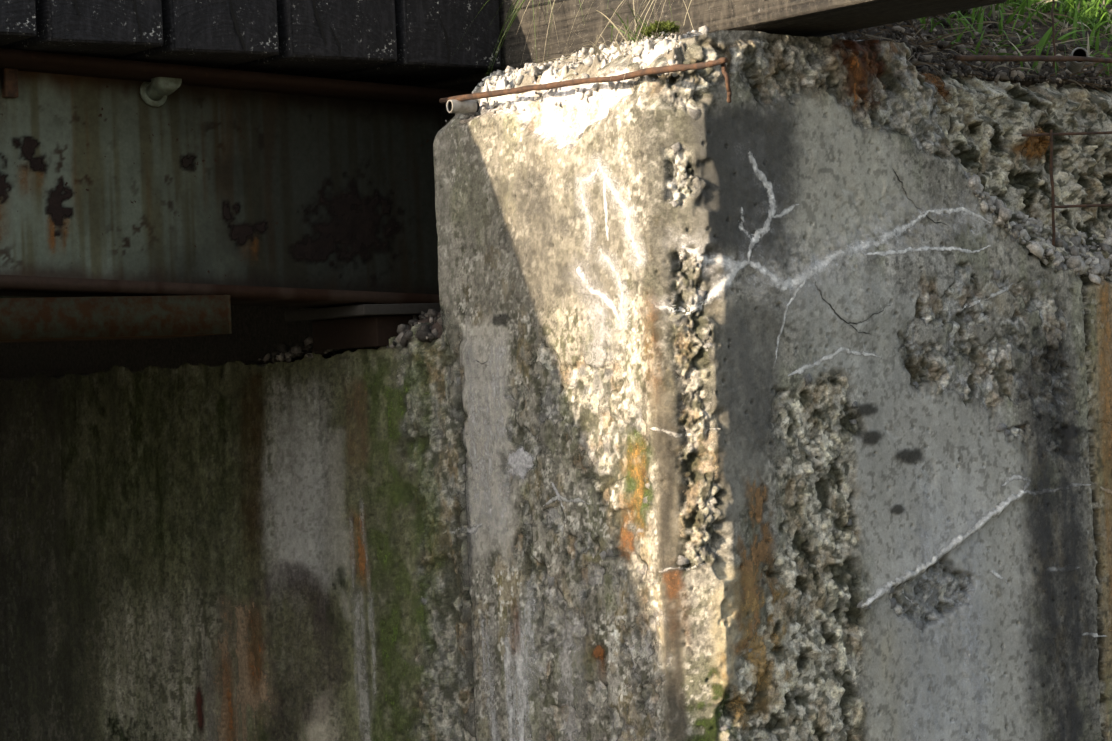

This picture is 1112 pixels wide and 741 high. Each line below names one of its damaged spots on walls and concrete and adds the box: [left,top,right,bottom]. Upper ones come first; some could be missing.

spalling [460,34,1112,287]
rust [833,39,897,109]
crack [570,159,644,368]
crack [655,152,991,376]
spalling [900,262,1081,457]
crack [961,281,1023,310]
rust [619,449,645,558]
rust [735,481,785,690]
spalling [719,371,872,741]
spalling [889,556,970,630]
crack [861,475,1112,608]